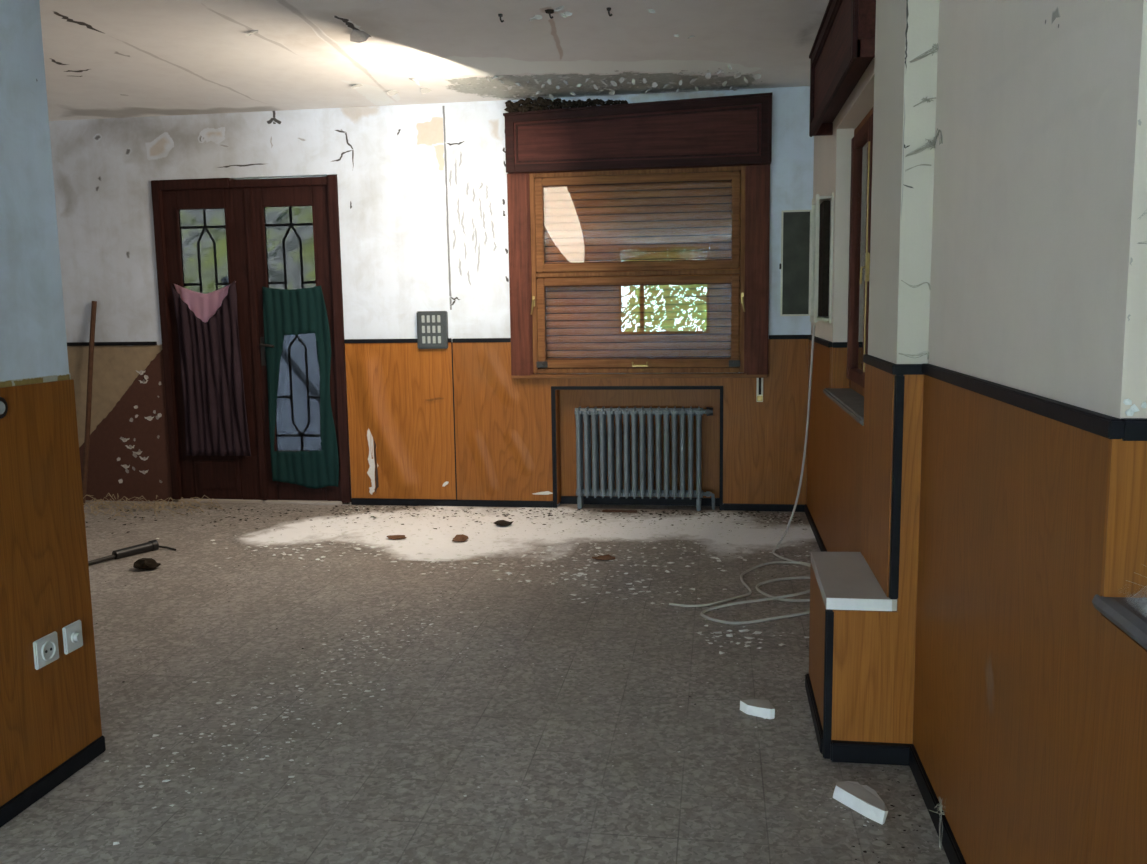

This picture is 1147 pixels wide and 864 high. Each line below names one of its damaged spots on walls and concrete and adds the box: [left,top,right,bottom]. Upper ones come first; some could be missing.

crack [49,11,268,104]
crack [200,0,401,136]
crack [330,129,354,171]
flaking render [415,116,445,172]
crack [442,106,465,310]
peeling [336,55,771,129]
crack [901,0,914,228]
peeling [0,341,172,502]